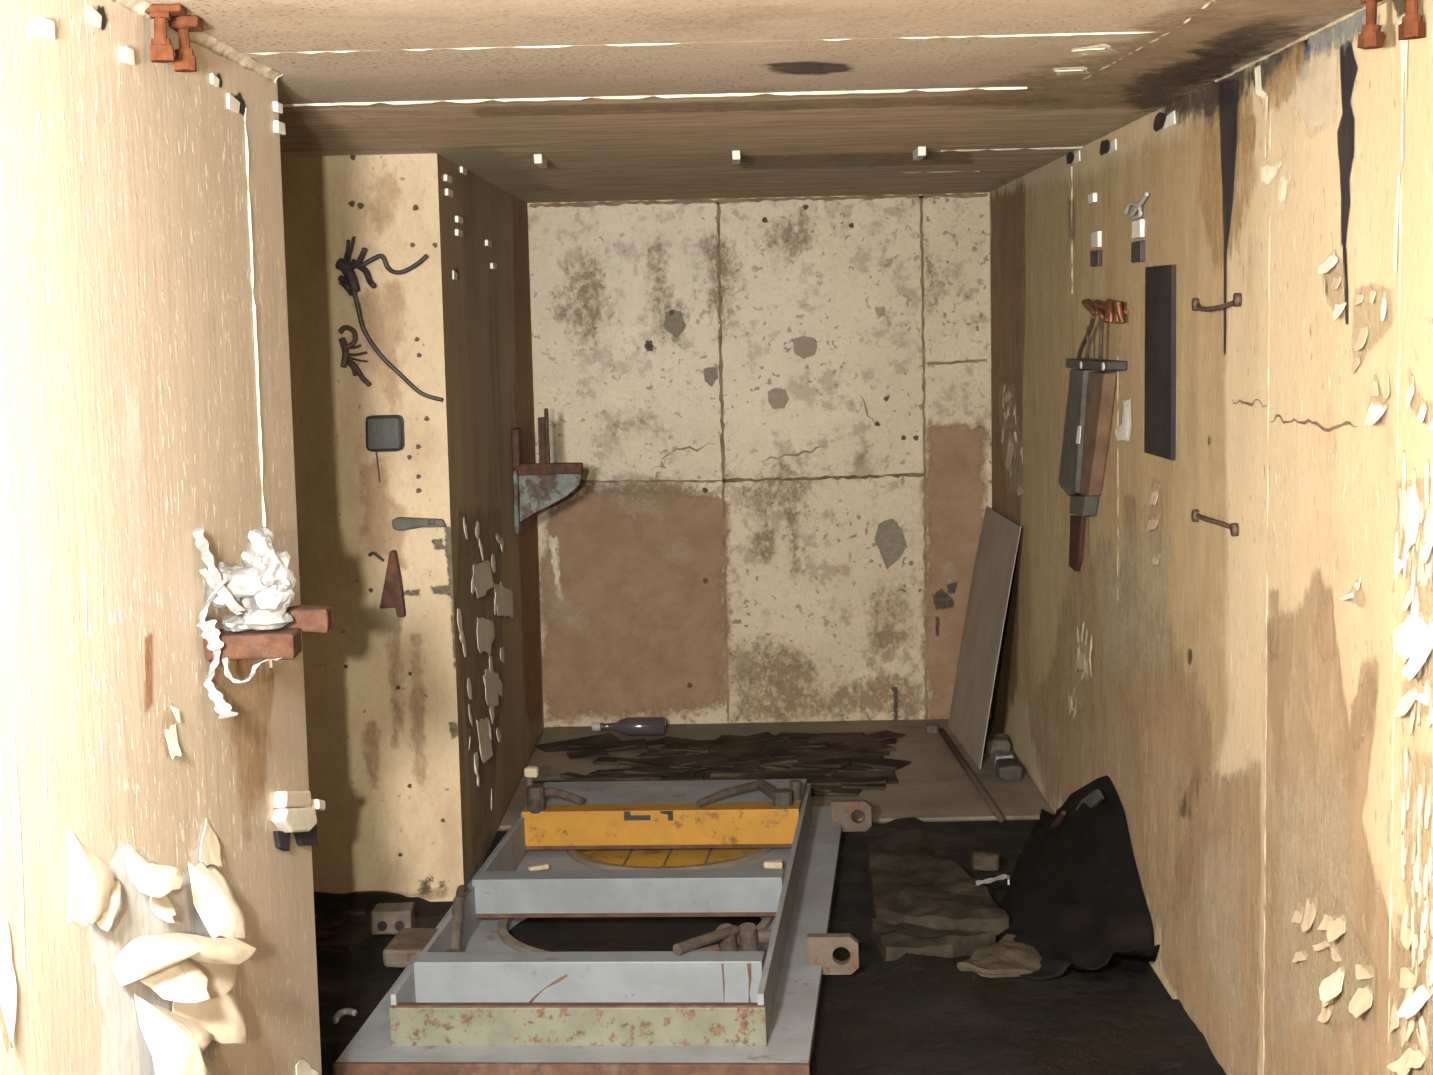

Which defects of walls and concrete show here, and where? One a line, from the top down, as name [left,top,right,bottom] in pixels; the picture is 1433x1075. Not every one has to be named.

water stain [1384,20,1408,272]
water stain [279,0,1366,553]
crack [1231,398,1358,448]
peeling [1317,249,1391,372]
peeling [1364,373,1389,425]
peeling [66,818,256,1075]
water stain [416,877,446,898]
peeling [404,511,513,854]
water stain [540,482,918,721]
water stain [921,170,1433,1075]
peeling [1291,884,1375,1025]
peeling [1387,450,1433,1075]